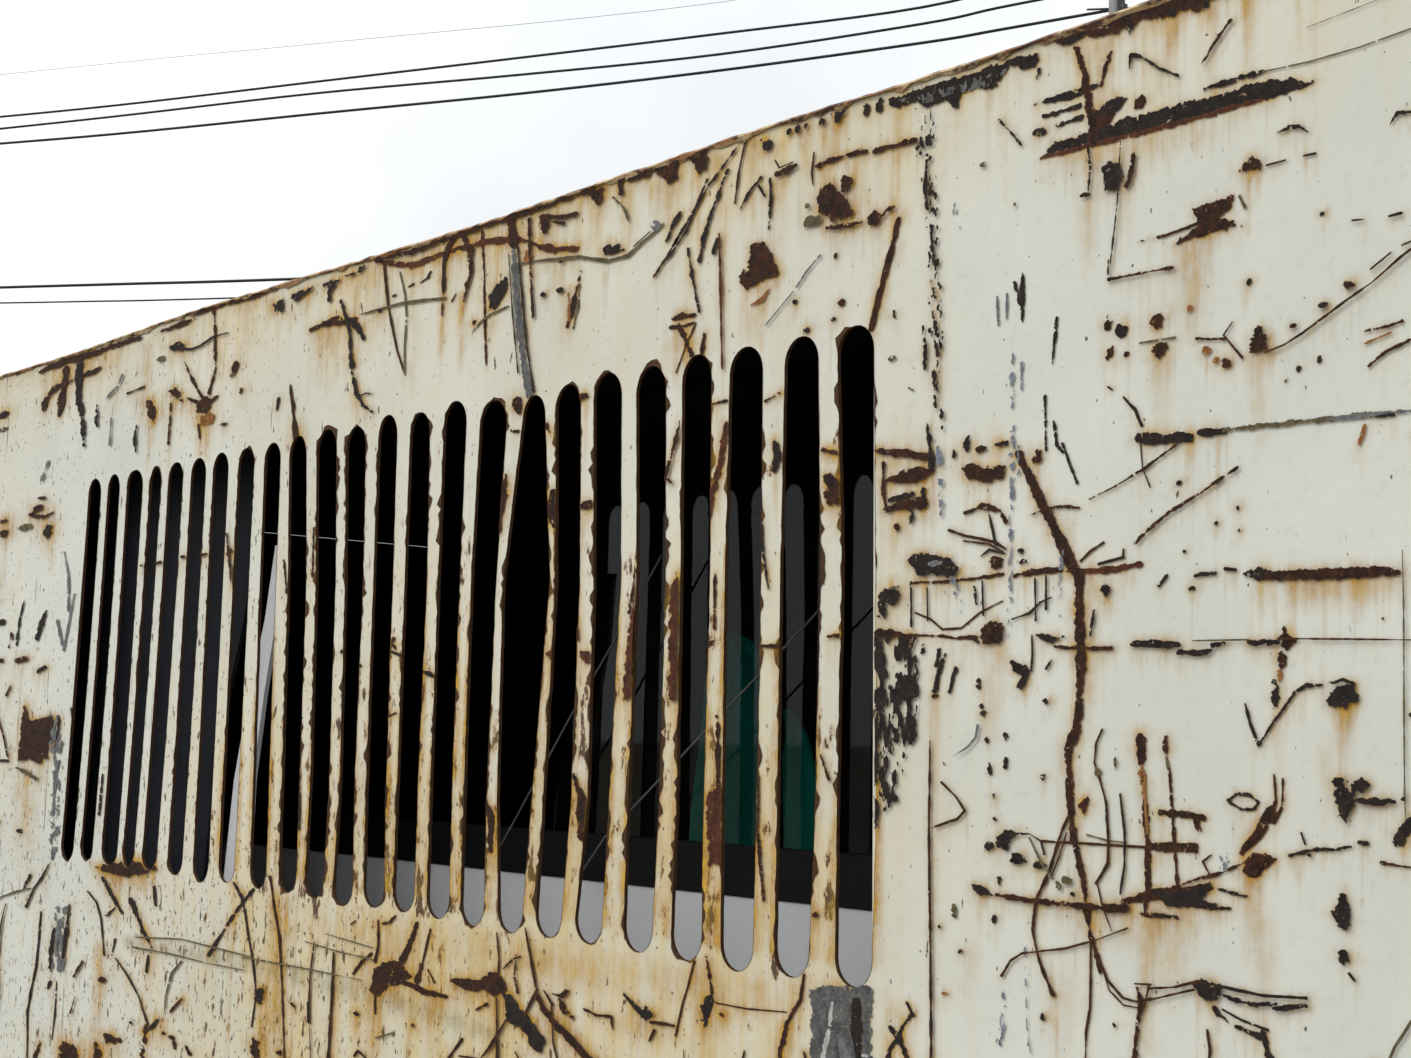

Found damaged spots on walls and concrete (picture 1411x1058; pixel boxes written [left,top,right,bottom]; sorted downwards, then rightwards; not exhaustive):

corrosion [803,175,896,230]
corrosion [309,235,475,340]
corrosion [739,241,781,306]
corrosion [146,292,269,445]
peeling [907,551,961,578]
peeling [1010,633,1113,691]
peeling [1130,639,1226,657]
peeling [874,584,958,829]
peeling [1219,774,1284,880]
corrosion [971,884,1132,913]
corrosion [352,920,507,1058]
peeling [808,985,874,1058]